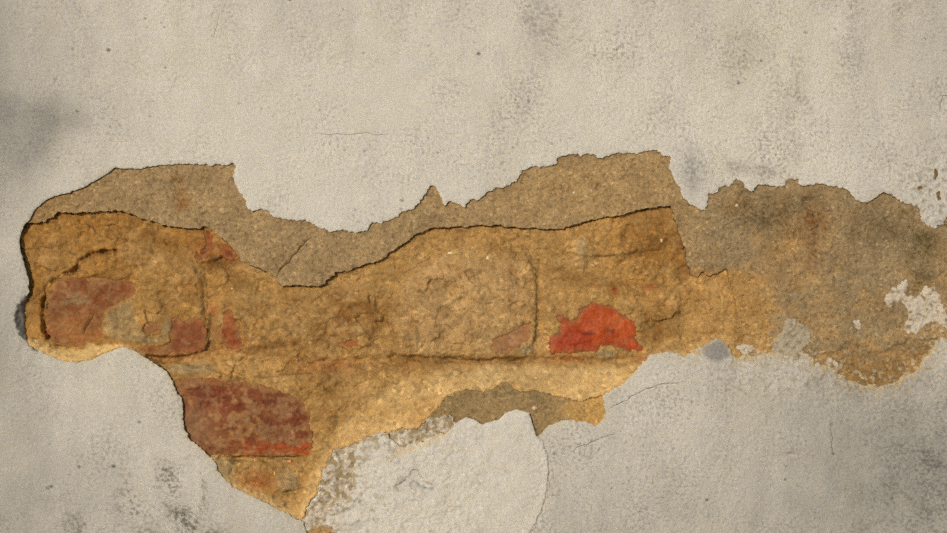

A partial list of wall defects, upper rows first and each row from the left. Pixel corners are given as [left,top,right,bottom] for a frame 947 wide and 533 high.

crack [277,239,308,275]
spalling [20,150,947,533]
crack [530,415,550,532]